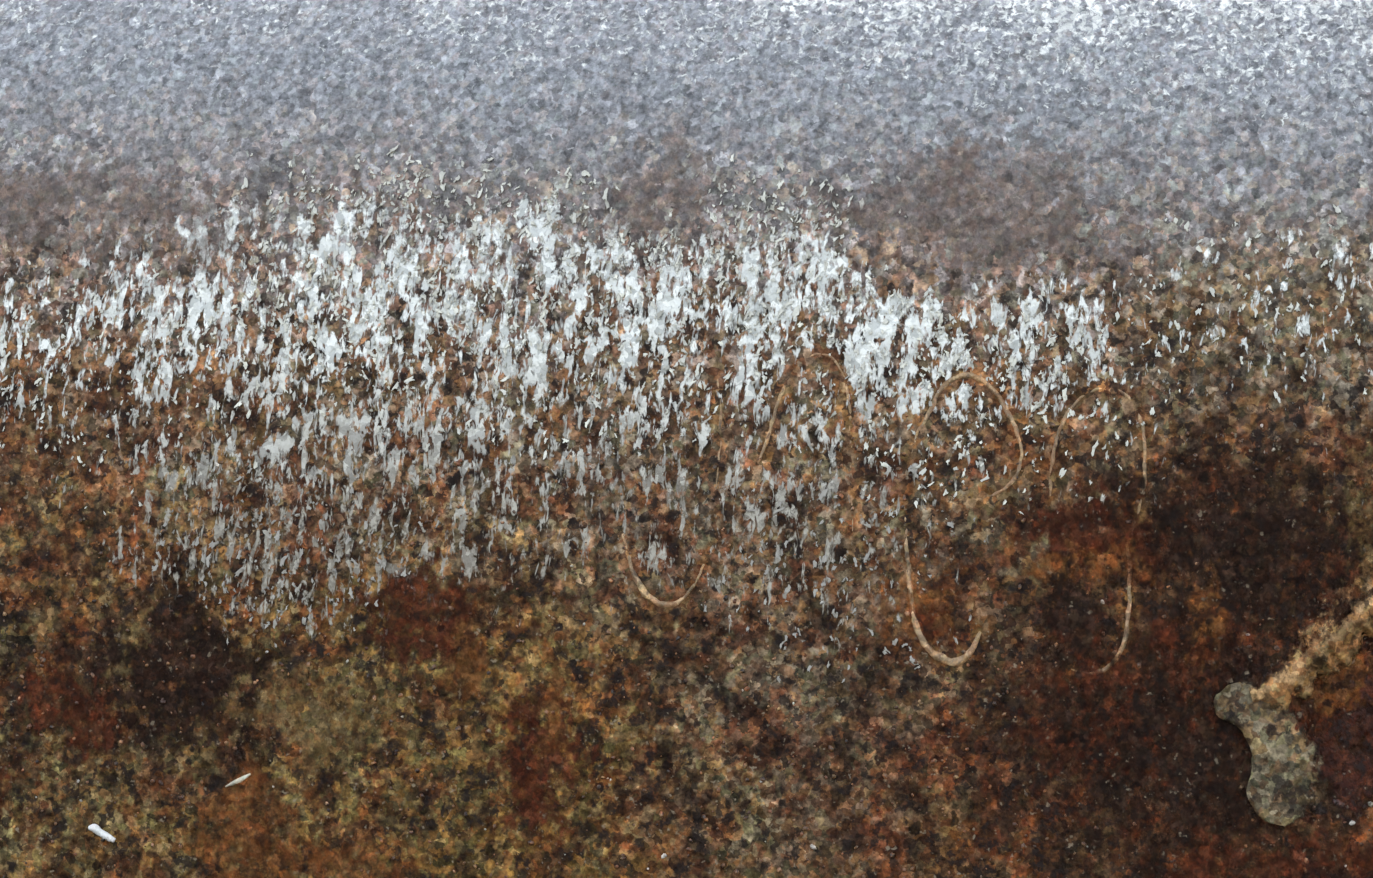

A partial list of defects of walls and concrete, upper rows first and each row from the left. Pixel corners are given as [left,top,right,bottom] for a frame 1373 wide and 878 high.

corrosion [17,560,418,878]
corrosion [344,532,490,699]
corrosion [484,639,606,846]
corrosion [879,554,953,650]
corrosion [1000,417,1373,878]
spalling [1214,579,1373,827]